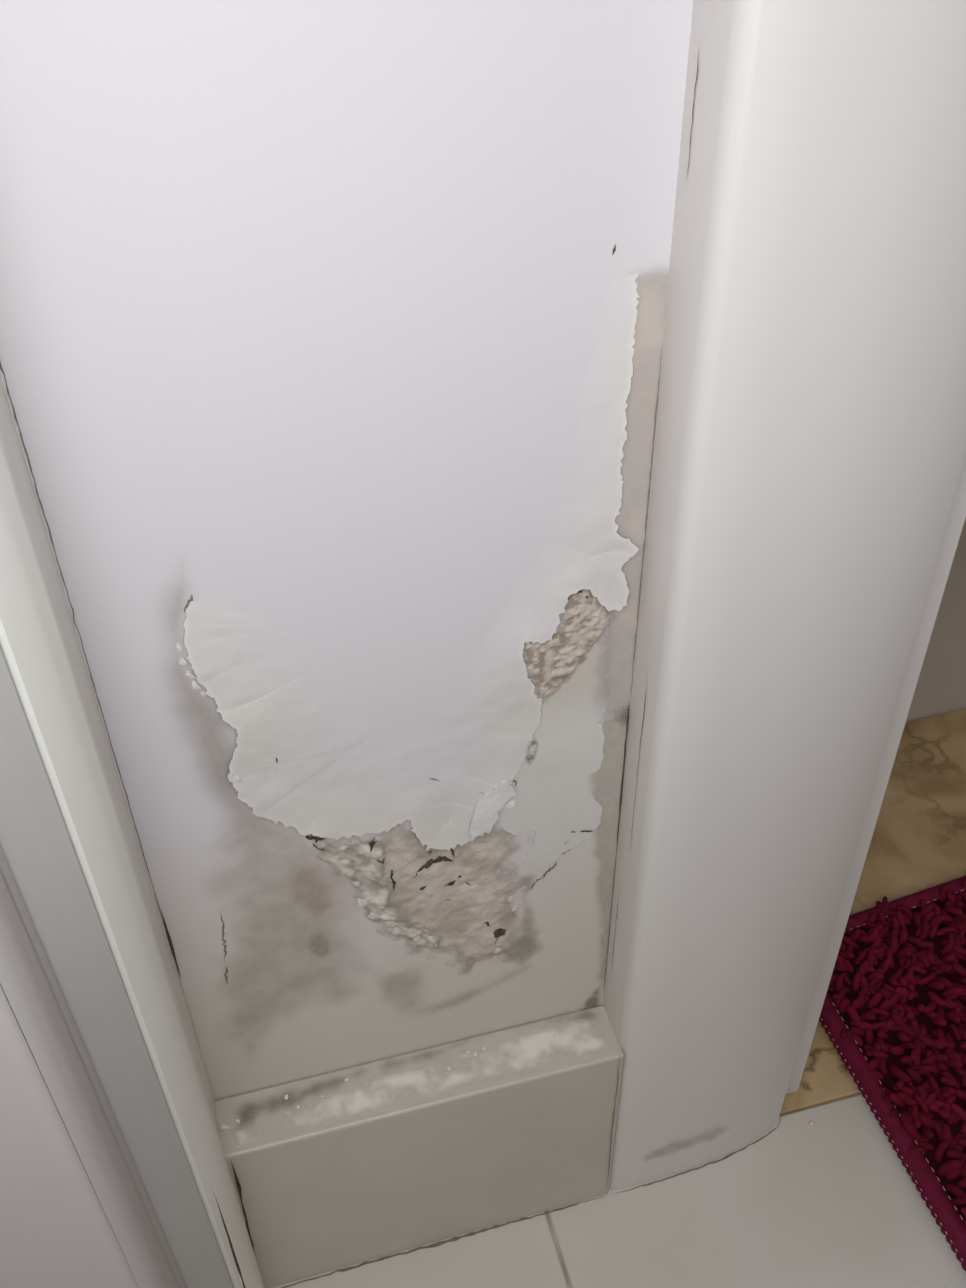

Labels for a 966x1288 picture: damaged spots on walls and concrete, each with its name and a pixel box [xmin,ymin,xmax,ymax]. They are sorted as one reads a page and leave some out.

peeling [176,265,639,972]